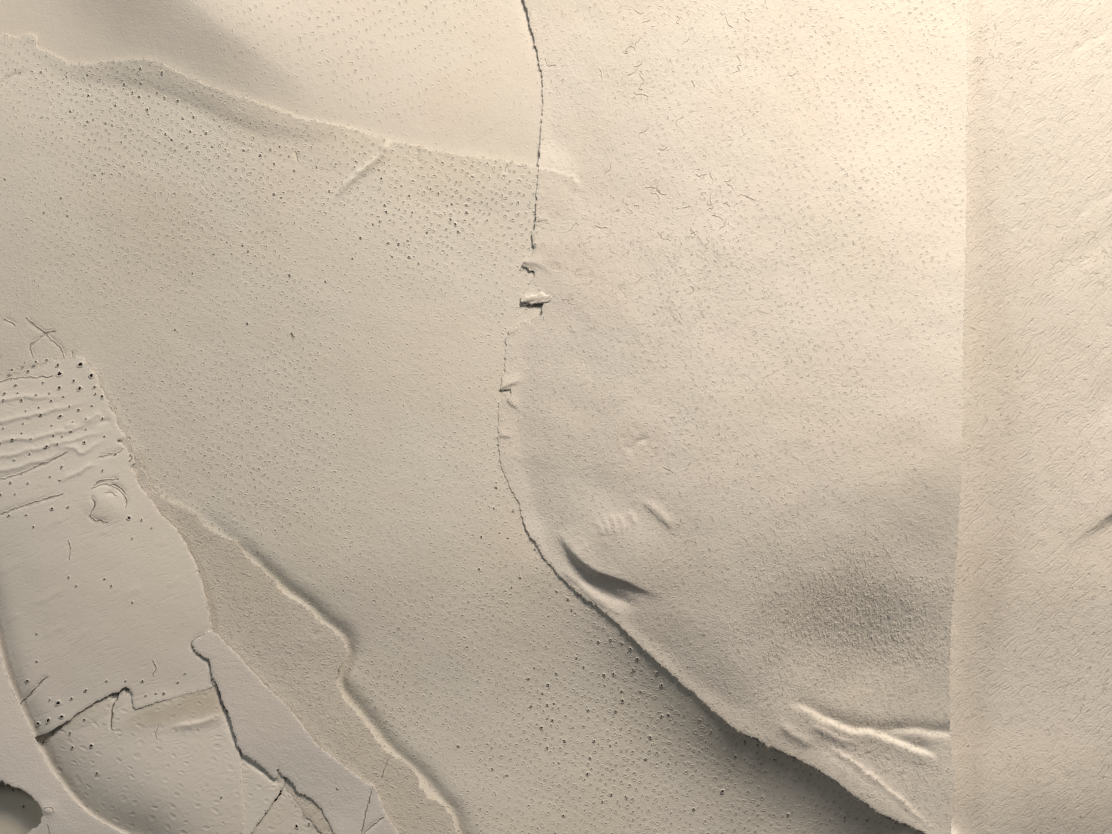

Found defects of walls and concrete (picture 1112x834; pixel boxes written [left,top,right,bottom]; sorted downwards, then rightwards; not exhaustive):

peeling [103,676,229,736]